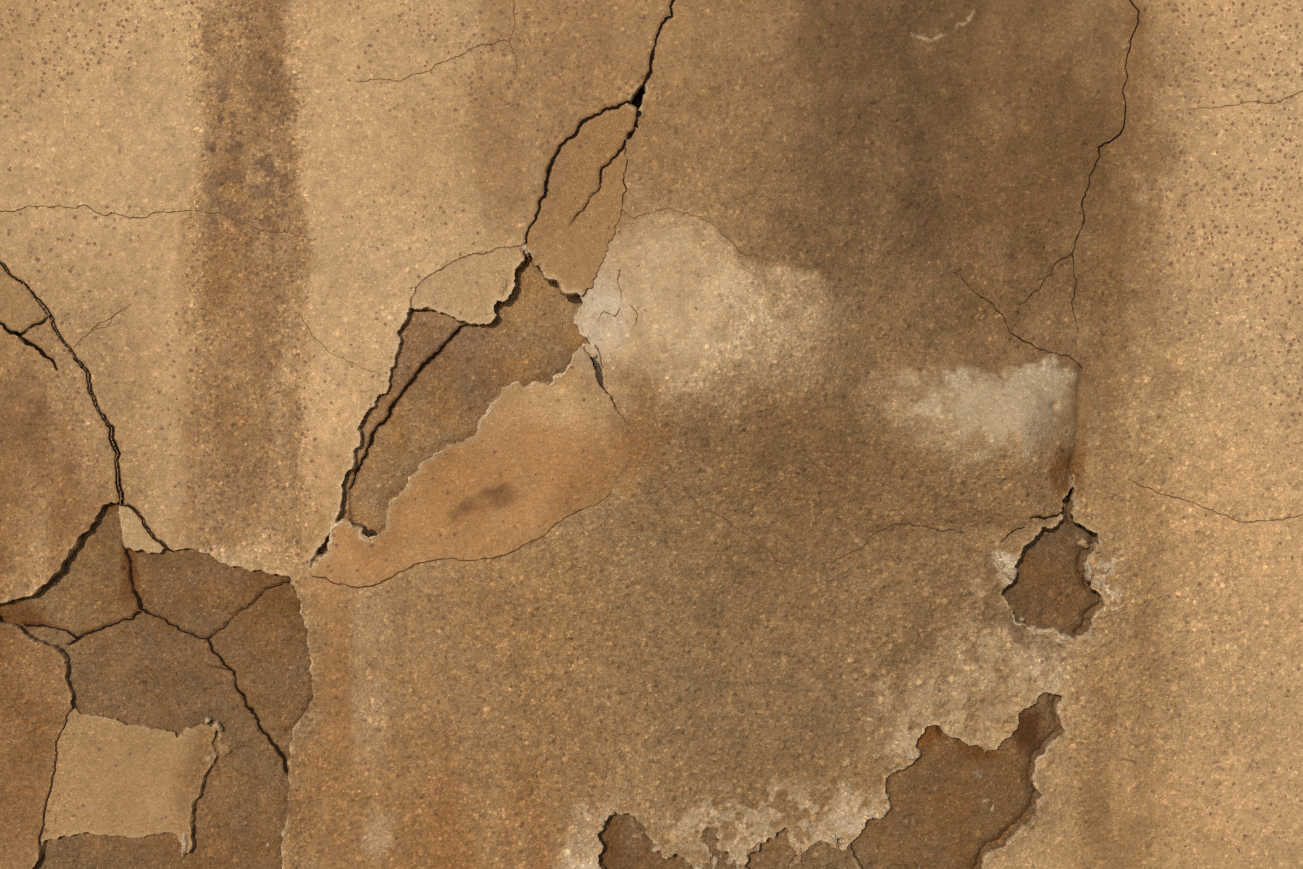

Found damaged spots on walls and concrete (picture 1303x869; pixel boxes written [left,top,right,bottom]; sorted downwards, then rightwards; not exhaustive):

spalling [0,262,314,869]
crack [0,204,317,240]
water stain [161,0,323,564]
crack [0,261,612,775]
spalling [310,103,637,568]
crack [409,0,765,368]
water stain [286,0,1254,869]
spalling [598,692,1068,869]
crack [954,0,1140,368]
spalling [994,477,1119,642]